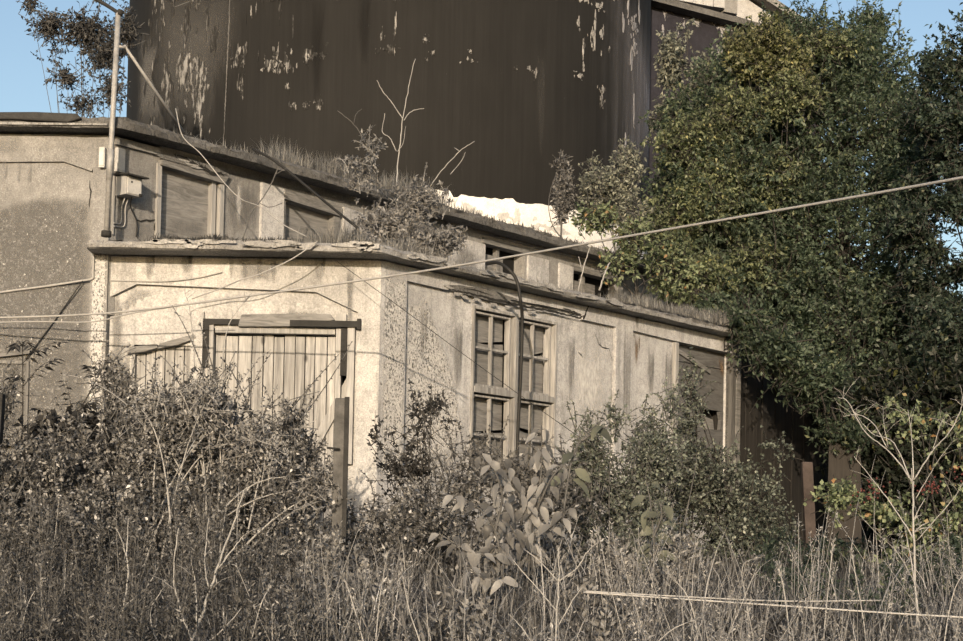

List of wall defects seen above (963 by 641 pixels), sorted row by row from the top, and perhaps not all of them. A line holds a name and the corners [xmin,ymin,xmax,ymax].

peeling [140,0,328,139]
peeling [574,0,615,81]
peeling [627,0,640,56]